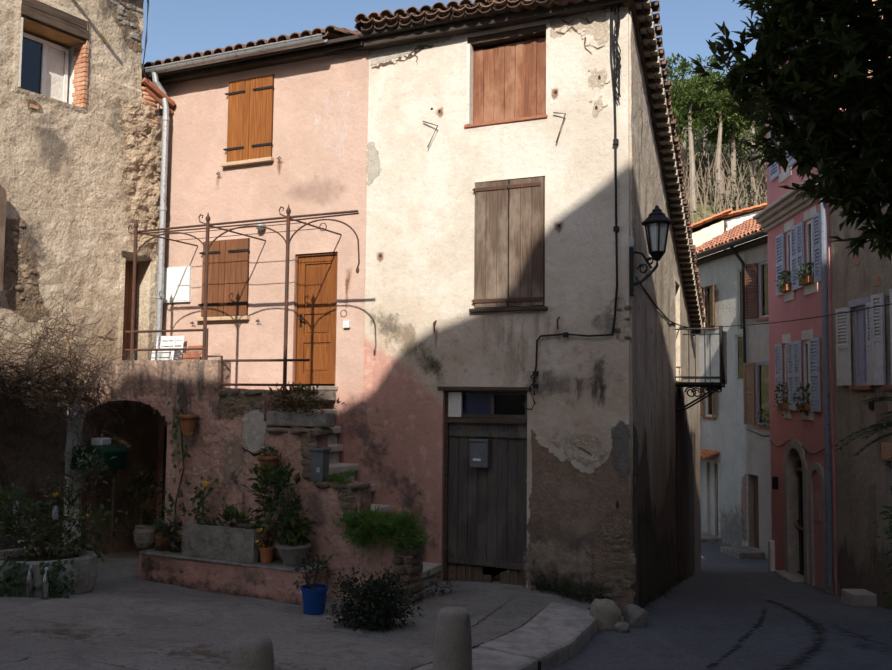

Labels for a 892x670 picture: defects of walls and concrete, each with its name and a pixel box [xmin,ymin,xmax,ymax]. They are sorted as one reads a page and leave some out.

water stain [592,361,604,399]
peeling [523,429,636,616]